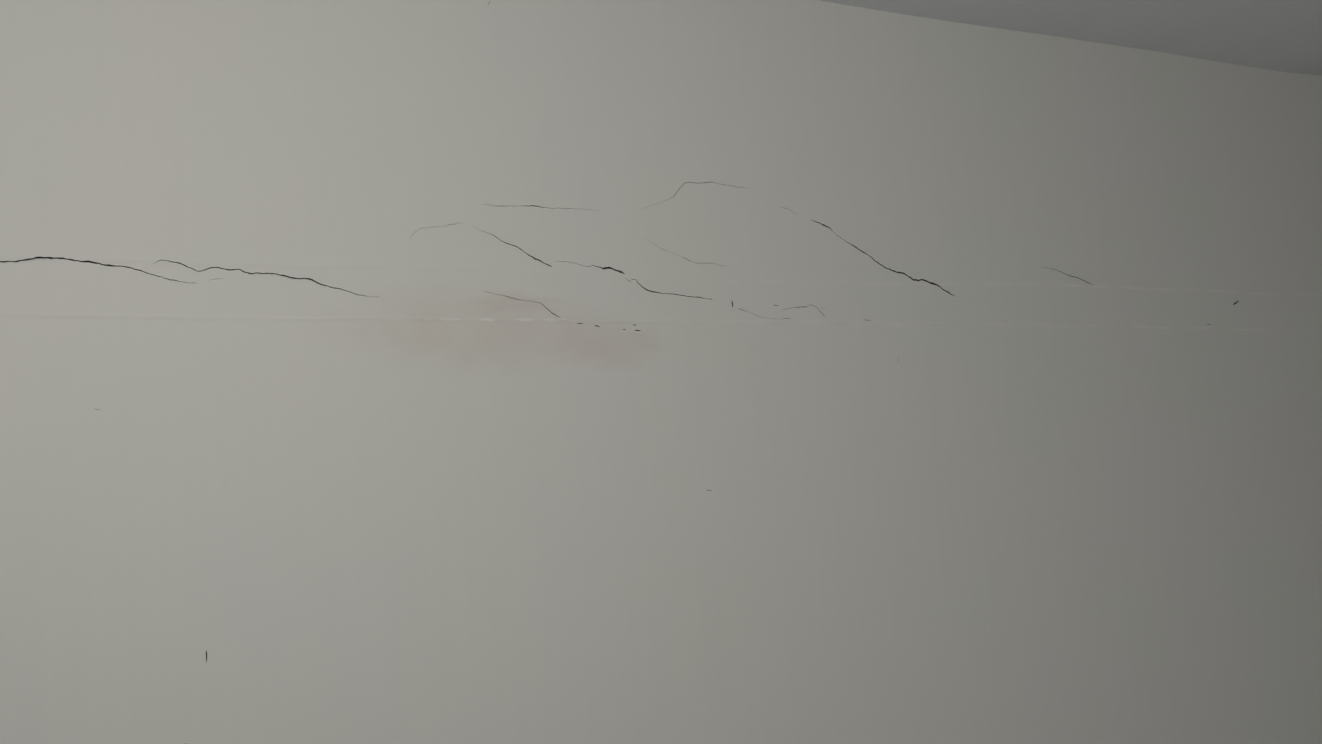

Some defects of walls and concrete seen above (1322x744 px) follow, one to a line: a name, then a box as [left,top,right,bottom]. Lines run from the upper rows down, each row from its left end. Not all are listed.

crack [0,257,376,297]
crack [410,204,826,319]
crack [781,207,957,297]